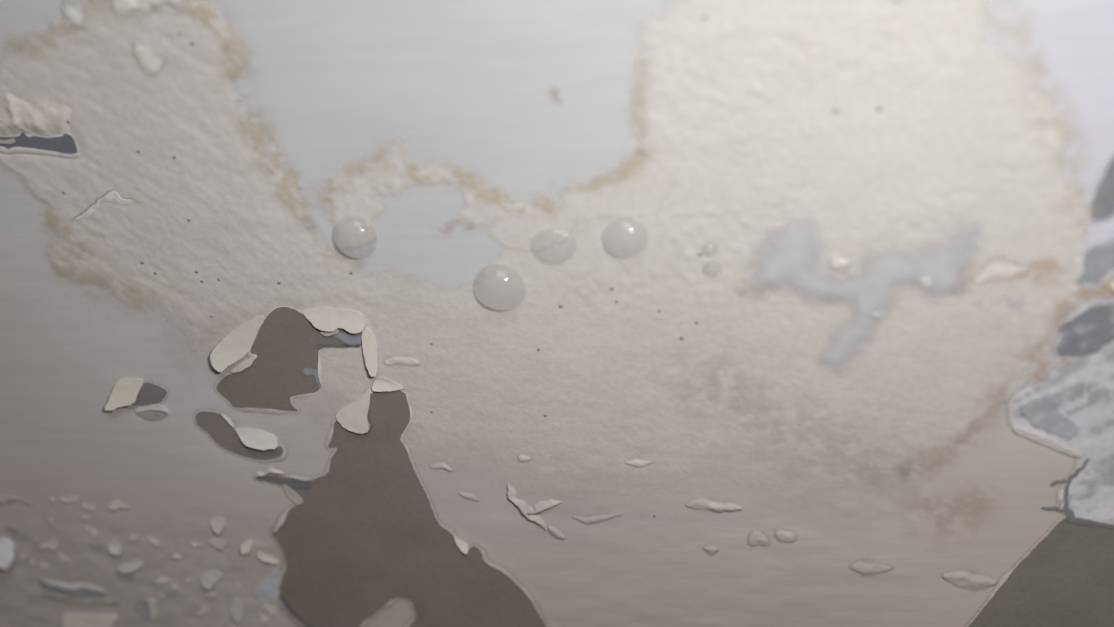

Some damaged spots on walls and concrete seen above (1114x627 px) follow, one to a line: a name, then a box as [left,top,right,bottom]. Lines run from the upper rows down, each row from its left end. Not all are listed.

flaking render [0,93,80,158]
damp [0,0,1088,491]
peeling [105,378,169,420]
peeling [191,306,550,627]
peeling [0,519,120,627]
peeling [50,496,180,580]
peeling [964,515,1114,627]